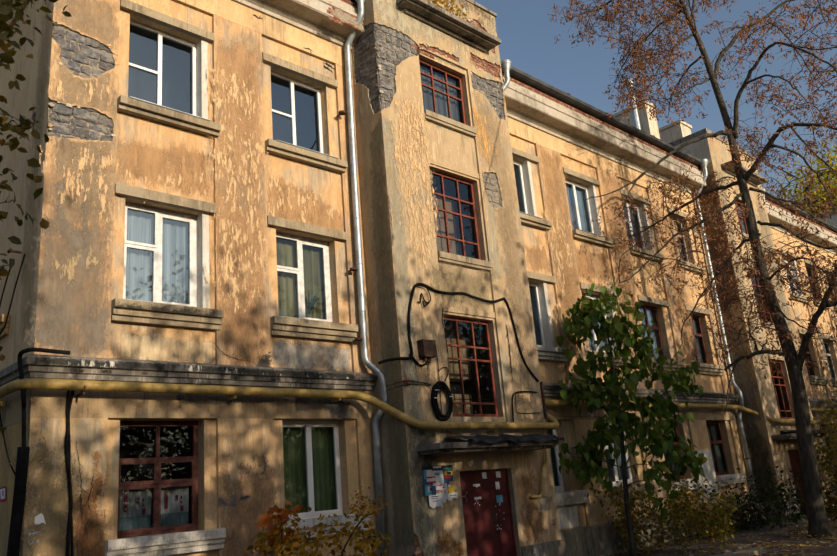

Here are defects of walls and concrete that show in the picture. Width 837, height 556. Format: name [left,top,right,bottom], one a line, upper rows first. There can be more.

flaking render [38,22,333,312]
peeling [352,21,505,273]
water stain [21,437,102,556]